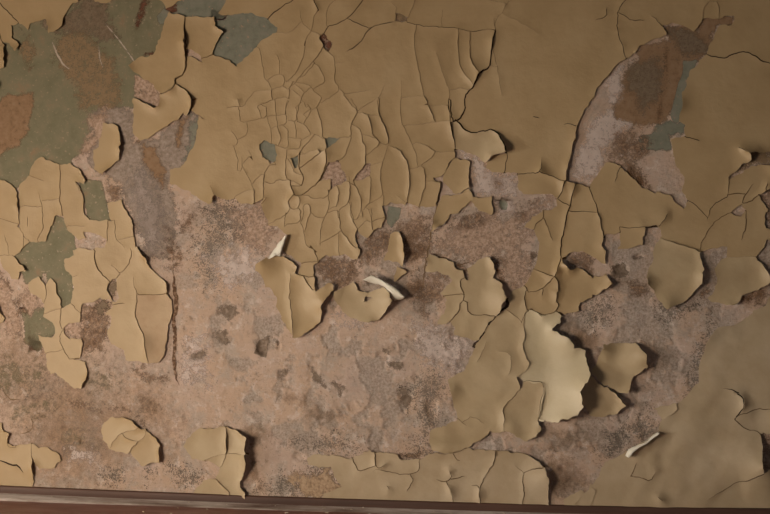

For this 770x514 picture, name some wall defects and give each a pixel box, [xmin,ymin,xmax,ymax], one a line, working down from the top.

peeling [128,0,292,141]
crack [705,51,770,64]
crack [228,0,667,290]
peeling [0,104,173,389]
crack [171,273,179,384]
peeling [212,201,407,338]
peeling [287,121,648,505]
crack [472,298,509,348]
peeling [647,212,732,309]
peeling [0,423,61,487]
peeling [184,426,249,499]
peeling [564,297,770,508]